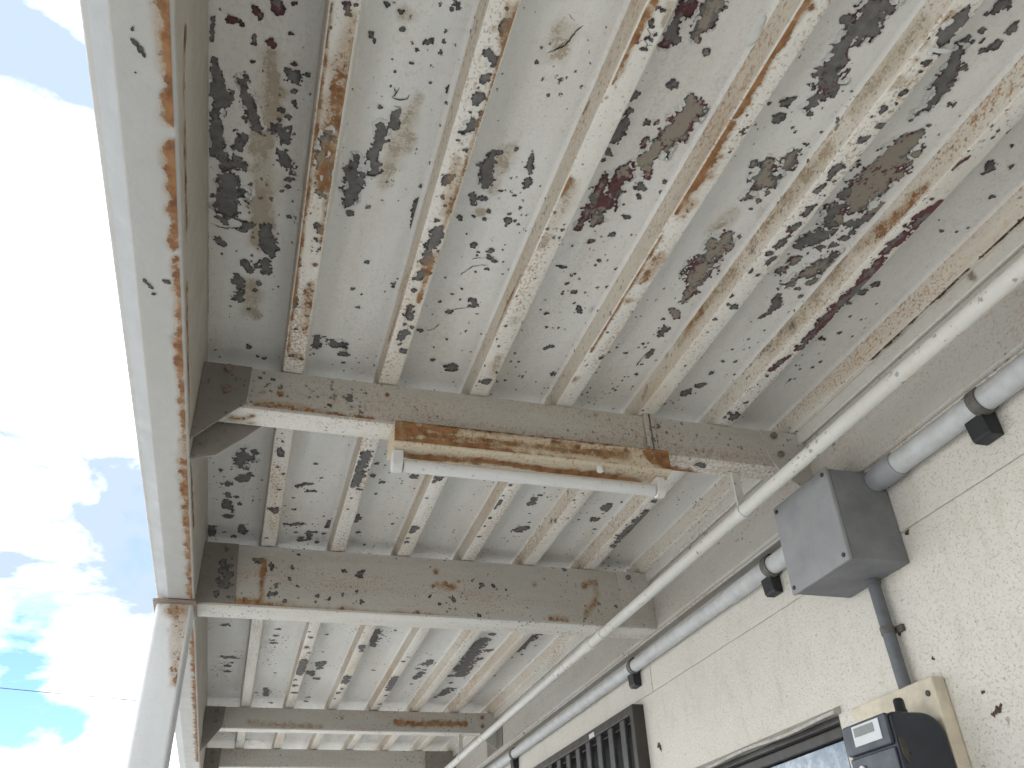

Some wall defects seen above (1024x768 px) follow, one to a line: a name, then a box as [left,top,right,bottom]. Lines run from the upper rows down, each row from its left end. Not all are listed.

rust [153,0,199,762]
peeling [208,56,311,311]
rust [287,3,350,358]
peeling [396,147,535,354]
rust [395,420,641,482]
rust [590,235,666,352]
peeling [573,78,711,244]
rust [643,448,695,473]
peeling [623,229,742,376]
rust [674,0,815,218]
peeling [765,198,970,377]
peeling [738,0,1020,319]